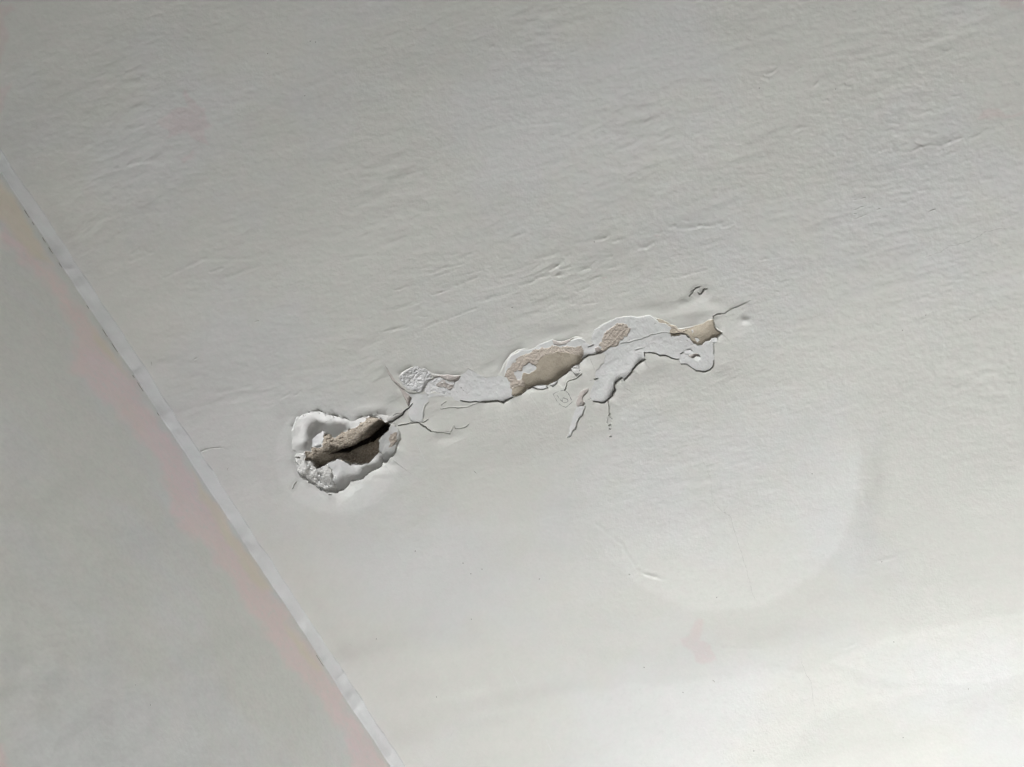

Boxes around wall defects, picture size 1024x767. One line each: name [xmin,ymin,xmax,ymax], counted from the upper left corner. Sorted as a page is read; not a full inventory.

crack [379,366,468,434]
peeling [399,301,748,438]
peeling [295,416,399,493]